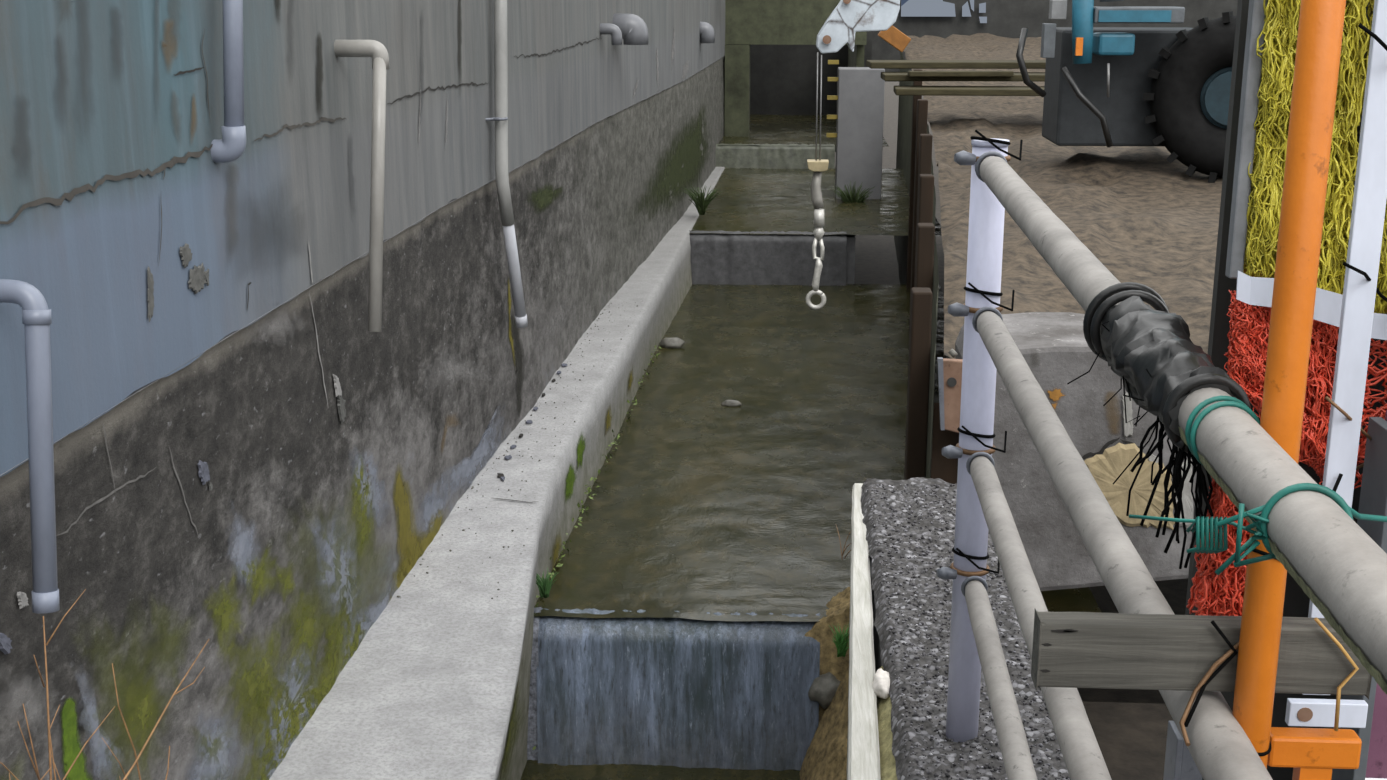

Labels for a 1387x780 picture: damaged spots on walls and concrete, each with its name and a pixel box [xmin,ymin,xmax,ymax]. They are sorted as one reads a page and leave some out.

crack [514,38,600,58]
crack [388,82,487,104]
crack [0,30,213,260]
crack [254,117,347,141]
peeling [180,243,209,294]
spalling [198,460,213,491]
leakage [232,523,255,581]
leakage [314,419,499,659]
leakage [83,696,116,772]
leakage [191,721,236,780]
leakage [261,657,316,779]